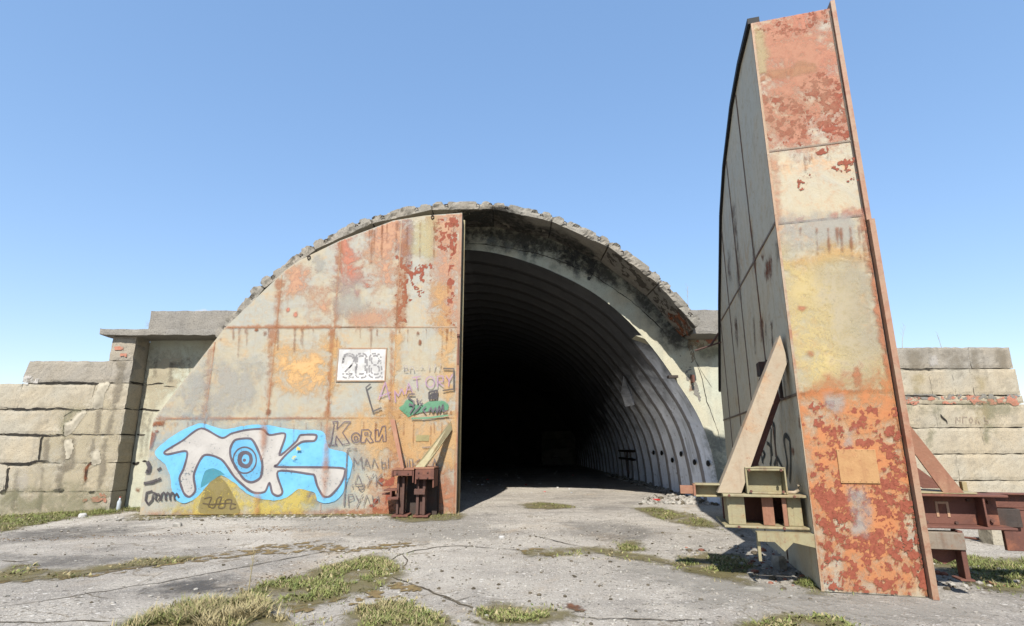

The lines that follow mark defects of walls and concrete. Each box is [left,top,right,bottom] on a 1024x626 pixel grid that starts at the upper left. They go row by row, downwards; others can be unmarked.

rust [755,9,848,170]
rust [271,339,341,394]
rust [283,265,330,320]
rust [330,213,462,514]
rust [792,210,916,595]